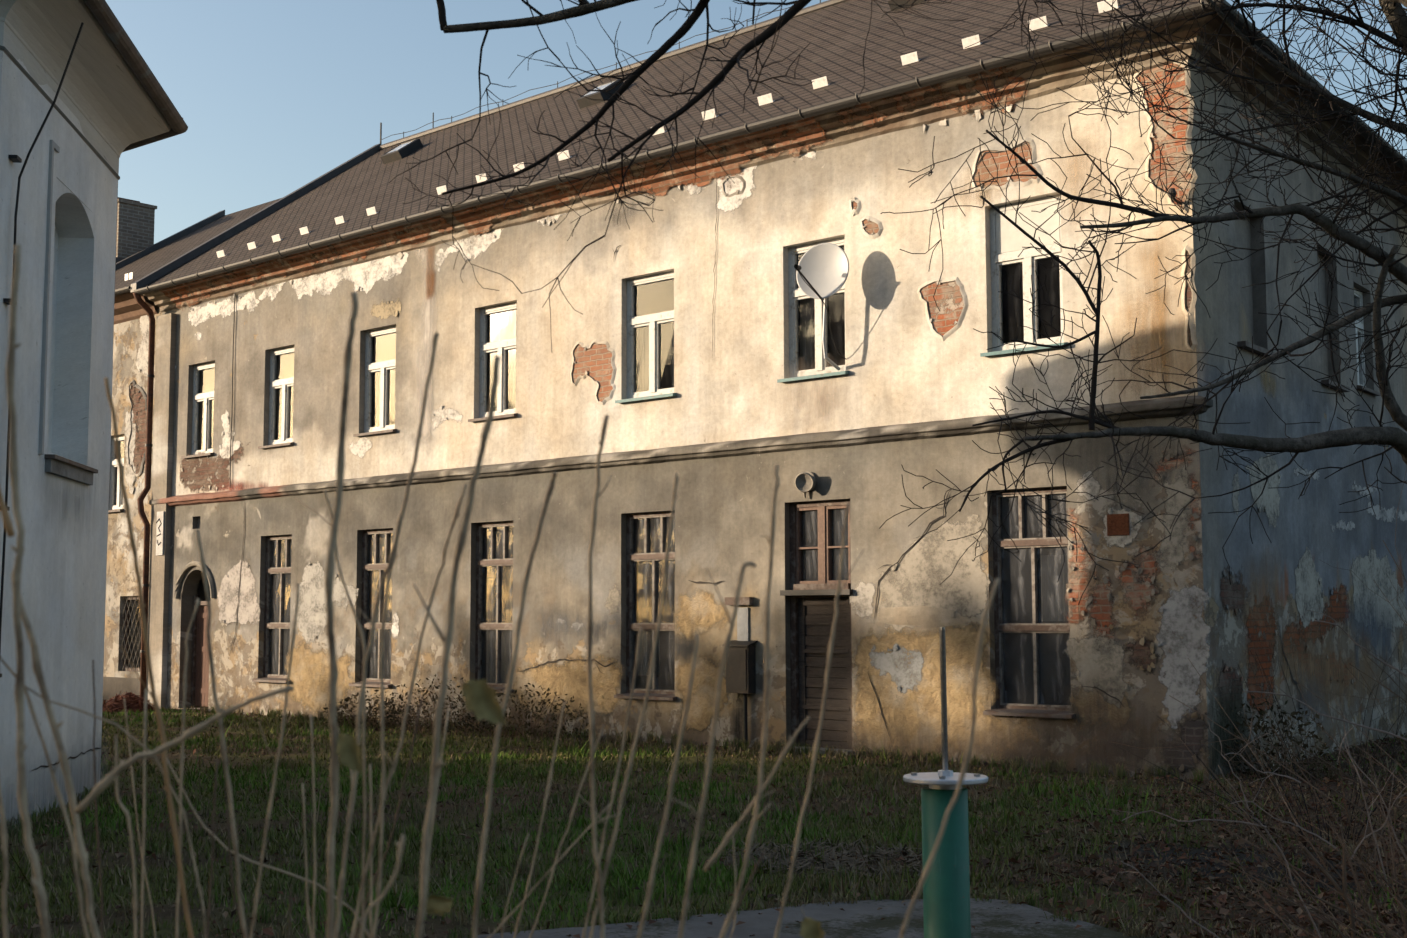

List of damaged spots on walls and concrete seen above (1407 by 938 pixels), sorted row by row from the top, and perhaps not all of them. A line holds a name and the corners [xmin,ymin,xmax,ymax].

peeling [677,166,757,214]
flaking render [970,137,1043,193]
flaking render [1133,61,1198,213]
peeling [435,229,503,272]
peeling [188,252,409,340]
flaking render [917,277,968,342]
peeling [124,315,149,494]
flaking render [570,339,616,405]
peeling [217,560,260,626]
peeling [1063,448,1277,741]
crack [516,659,615,673]
flaking render [849,514,1040,758]